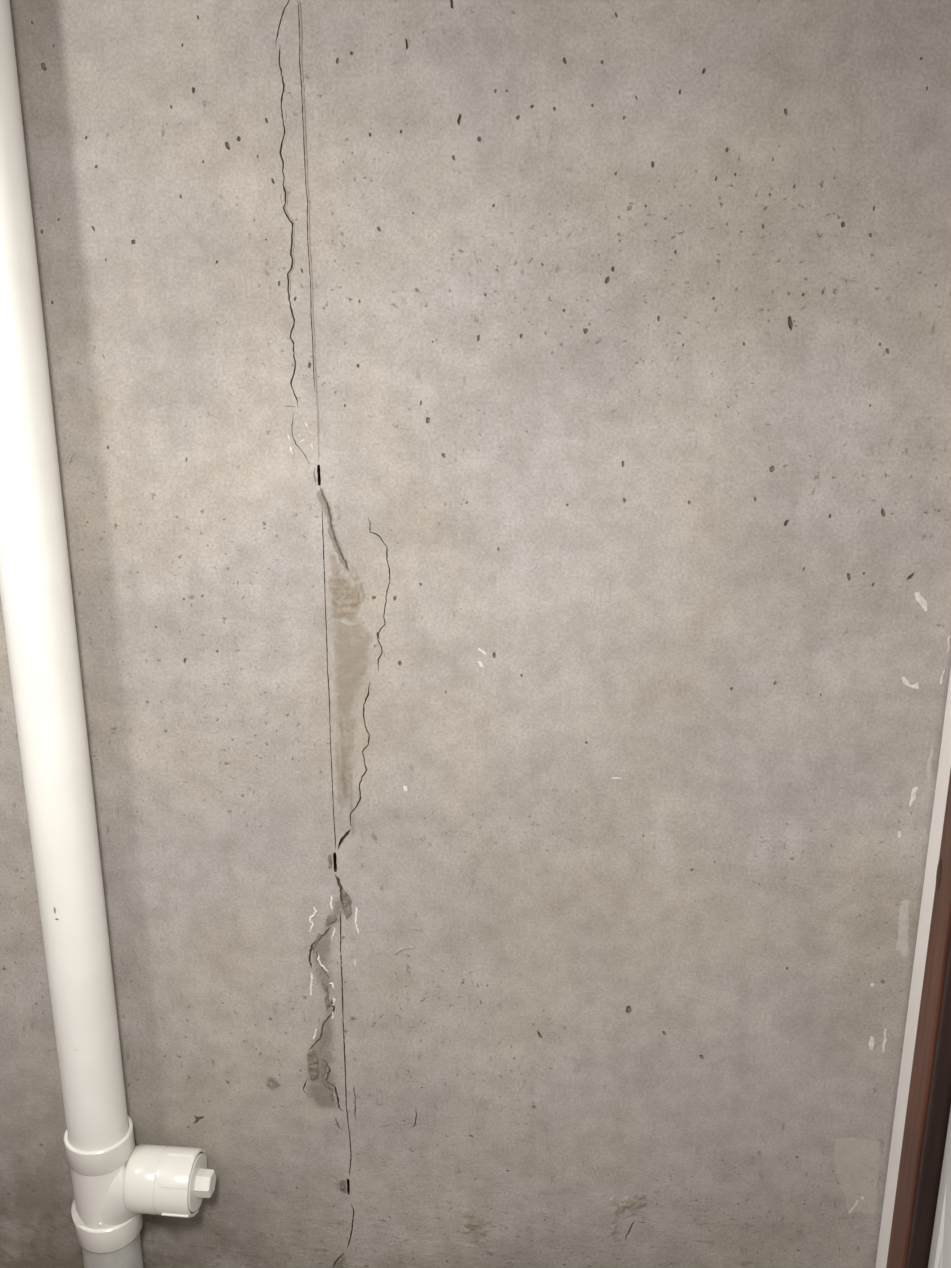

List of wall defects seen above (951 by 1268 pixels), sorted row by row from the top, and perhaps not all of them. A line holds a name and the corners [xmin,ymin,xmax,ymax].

crack [276,0,309,462]
crack [338,518,390,849]
peeling [303,855,351,1130]
crack [333,1204,354,1268]